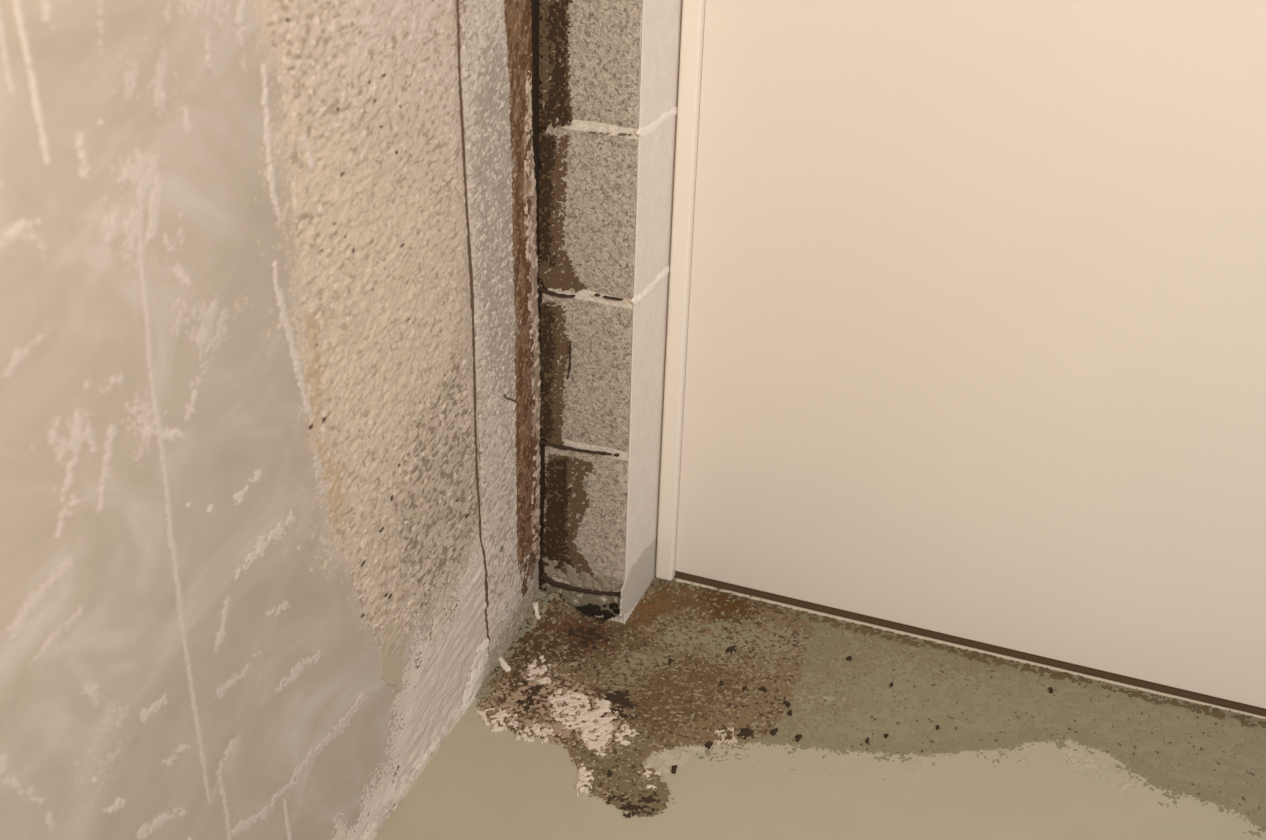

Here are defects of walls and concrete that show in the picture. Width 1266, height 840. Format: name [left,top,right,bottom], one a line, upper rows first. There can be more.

leakage [29,0,521,668]
crack [456,0,623,654]
crack [589,129,632,137]
leakage [362,0,1266,840]